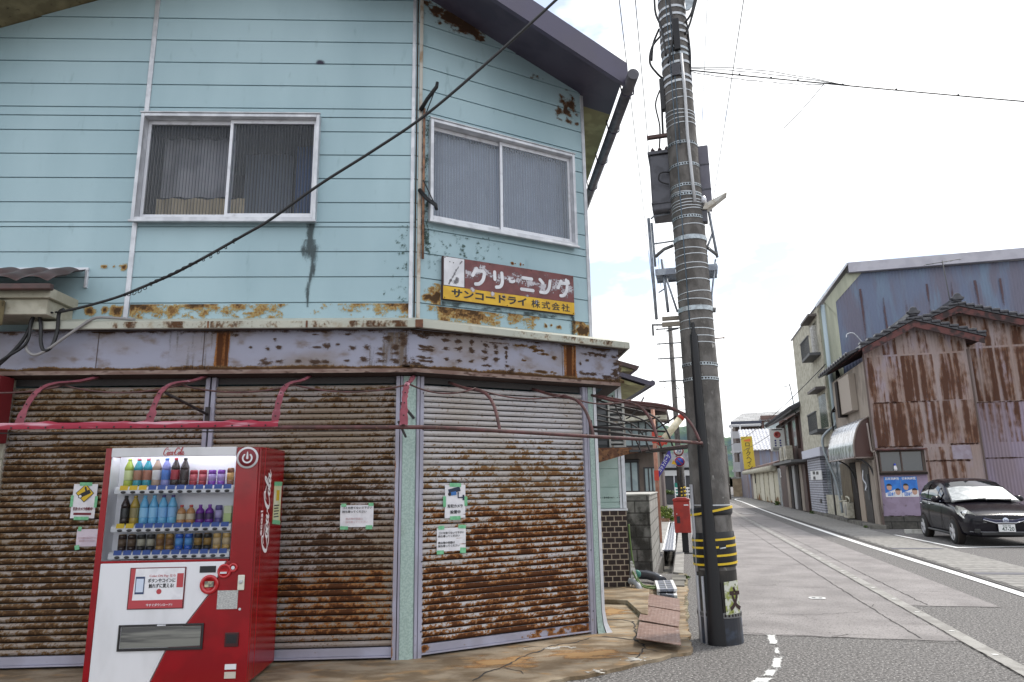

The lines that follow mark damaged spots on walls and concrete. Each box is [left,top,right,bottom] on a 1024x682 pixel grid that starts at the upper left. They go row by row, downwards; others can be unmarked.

corrosion [555,90,579,126]
damp [301,223,317,307]
corrosion [0,320,624,383]
corrosion [867,302,1024,481]
corrosion [0,387,205,656]
corrosion [218,385,396,658]
corrosion [421,440,589,653]